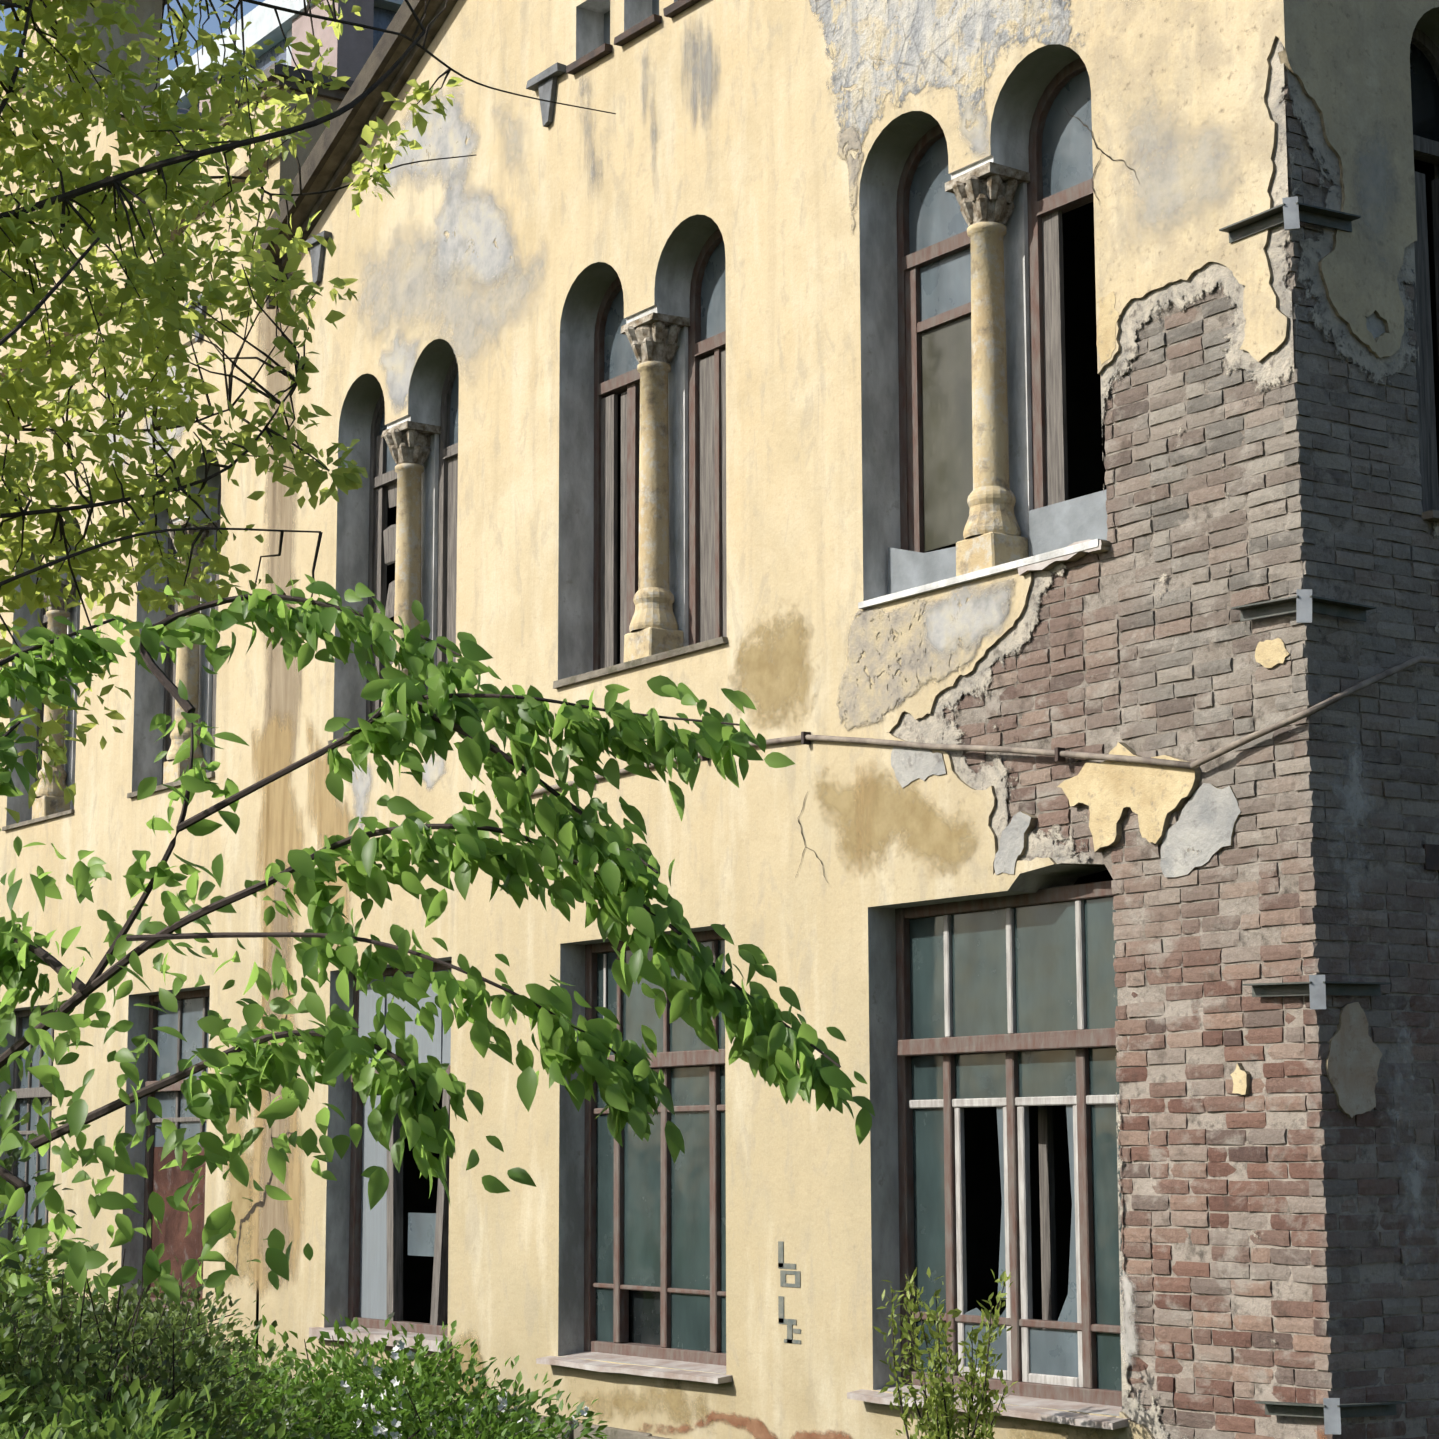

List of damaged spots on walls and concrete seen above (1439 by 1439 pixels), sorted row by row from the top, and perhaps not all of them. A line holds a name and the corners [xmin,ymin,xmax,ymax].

peeling [809,0,1085,231]
flaking render [1267,38,1342,211]
water stain [252,272,349,1046]
water stain [732,618,809,726]
water stain [817,775,975,872]
flaking render [837,221,1439,1439]
water stain [227,1085,301,1291]
crack [236,1092,293,1270]